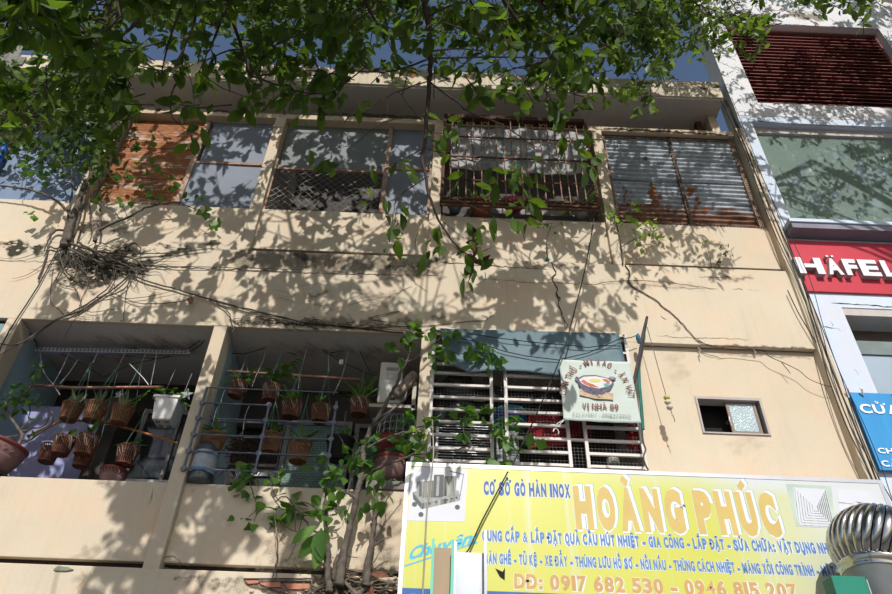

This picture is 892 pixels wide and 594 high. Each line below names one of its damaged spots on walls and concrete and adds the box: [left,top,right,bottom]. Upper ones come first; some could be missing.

rust [648,183,662,208]
water stain [231,250,447,280]
crack [150,252,716,306]
water stain [308,290,445,330]